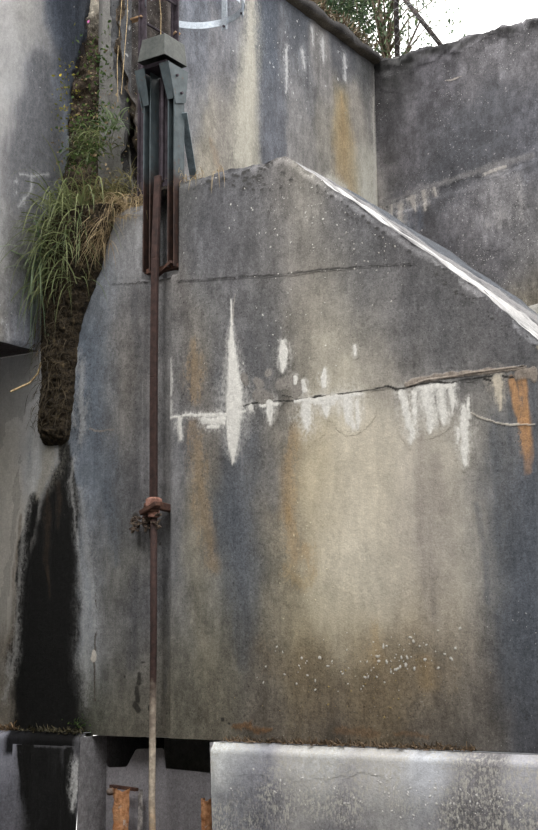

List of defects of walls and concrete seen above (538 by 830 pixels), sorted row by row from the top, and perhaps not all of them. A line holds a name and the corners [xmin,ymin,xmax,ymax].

crack [243,364,525,407]
rust [510,380,531,451]
water stain [0,281,150,737]
water stain [170,297,376,681]
water stain [162,560,170,696]
water stain [11,744,80,830]
water stain [214,757,394,800]
water stain [450,792,499,830]